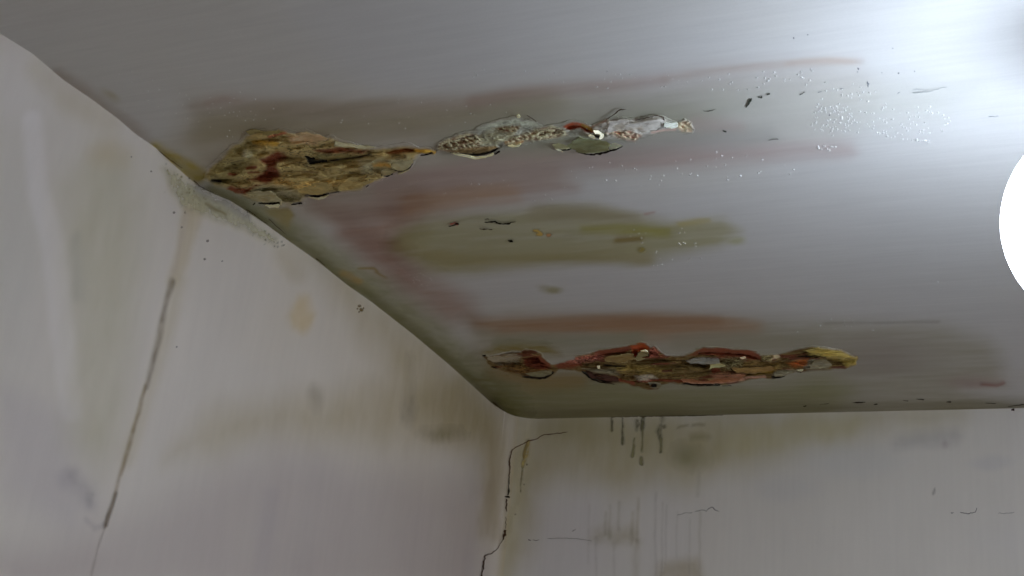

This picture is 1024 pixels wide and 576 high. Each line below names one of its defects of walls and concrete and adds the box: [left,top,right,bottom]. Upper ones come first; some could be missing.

spalling [202,109,695,209]
spalling [482,341,859,391]
crack [481,432,590,576]